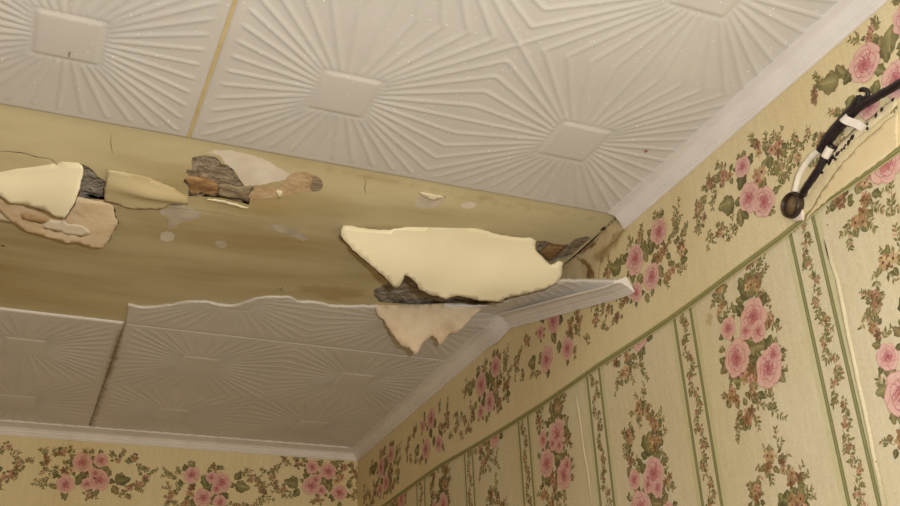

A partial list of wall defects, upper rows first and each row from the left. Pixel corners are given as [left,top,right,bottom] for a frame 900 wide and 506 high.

peeling [0,150,323,249]
peeling [339,226,590,355]